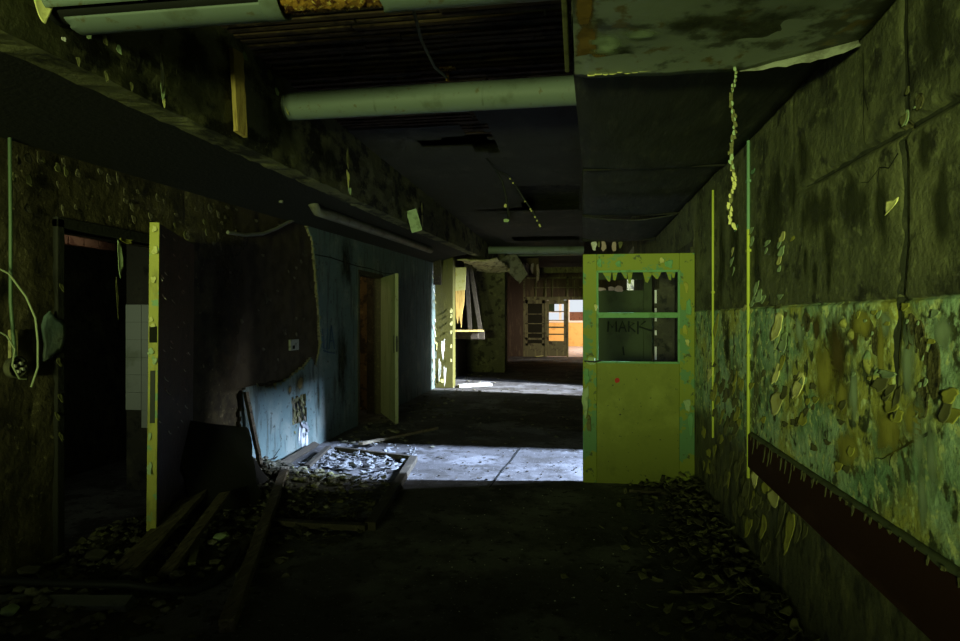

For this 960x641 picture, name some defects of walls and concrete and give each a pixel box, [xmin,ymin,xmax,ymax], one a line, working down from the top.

damp [591,30,654,56]
damp [723,11,799,40]
peeling [727,67,795,272]
peeling [236,226,453,482]
peeling [749,281,847,427]
peeling [851,302,960,424]
peeling [683,362,808,567]
peeling [750,437,901,543]